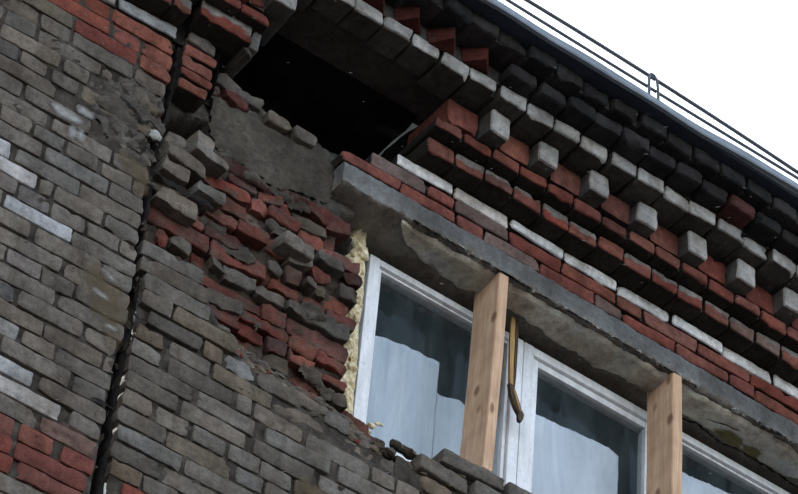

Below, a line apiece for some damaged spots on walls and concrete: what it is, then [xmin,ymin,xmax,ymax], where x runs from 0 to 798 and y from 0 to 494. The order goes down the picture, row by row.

crack [90,20,213,494]
spalling [84,0,424,465]